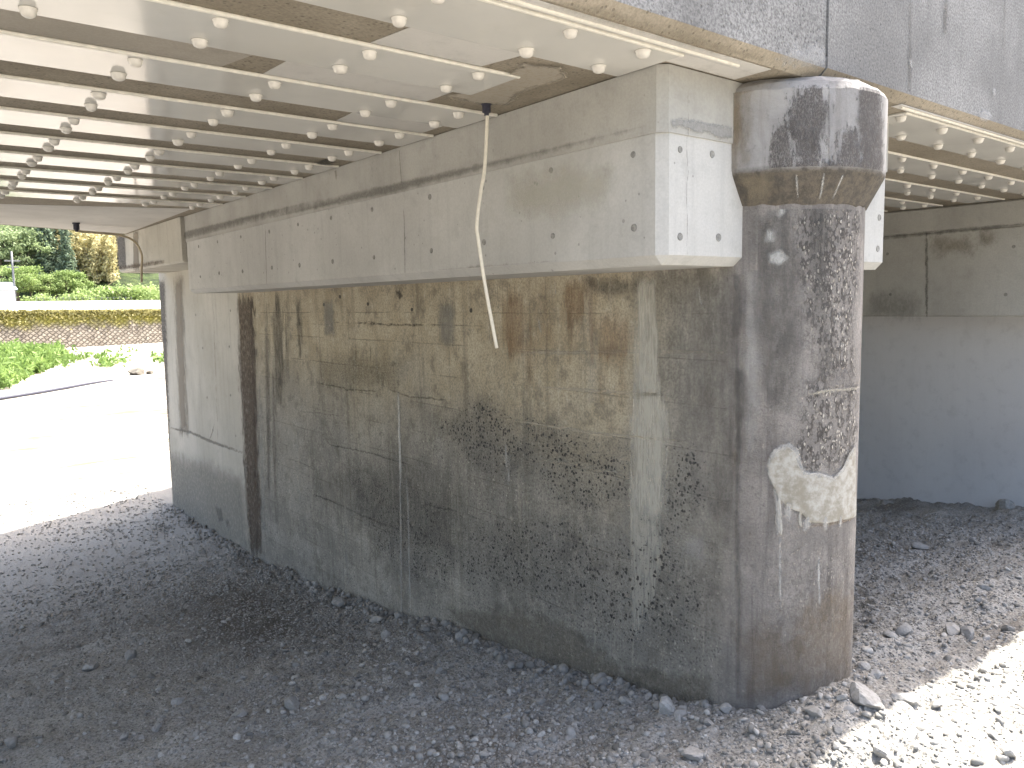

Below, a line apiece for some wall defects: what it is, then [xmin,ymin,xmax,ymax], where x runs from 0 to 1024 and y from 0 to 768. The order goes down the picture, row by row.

damp [159,281,282,553]
damp [630,282,665,637]
spalling [768,210,861,535]